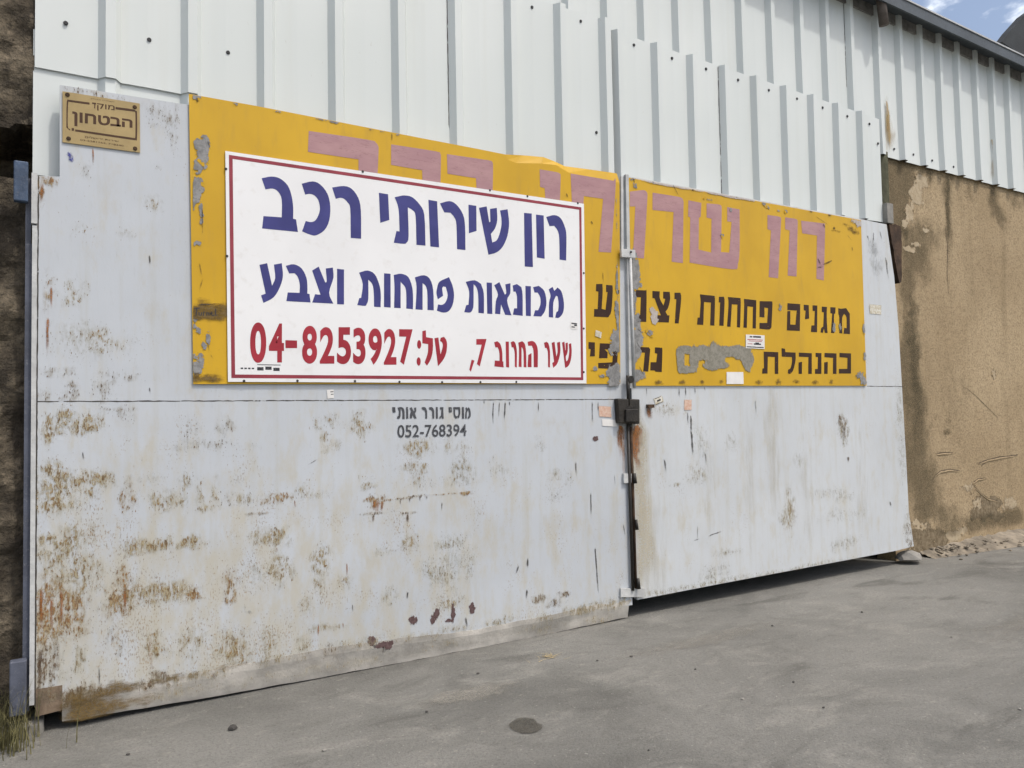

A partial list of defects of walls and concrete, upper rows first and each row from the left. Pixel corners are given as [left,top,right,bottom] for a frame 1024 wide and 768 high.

damp [888,158,927,313]
spalling [901,173,930,253]
damp [900,327,1022,532]